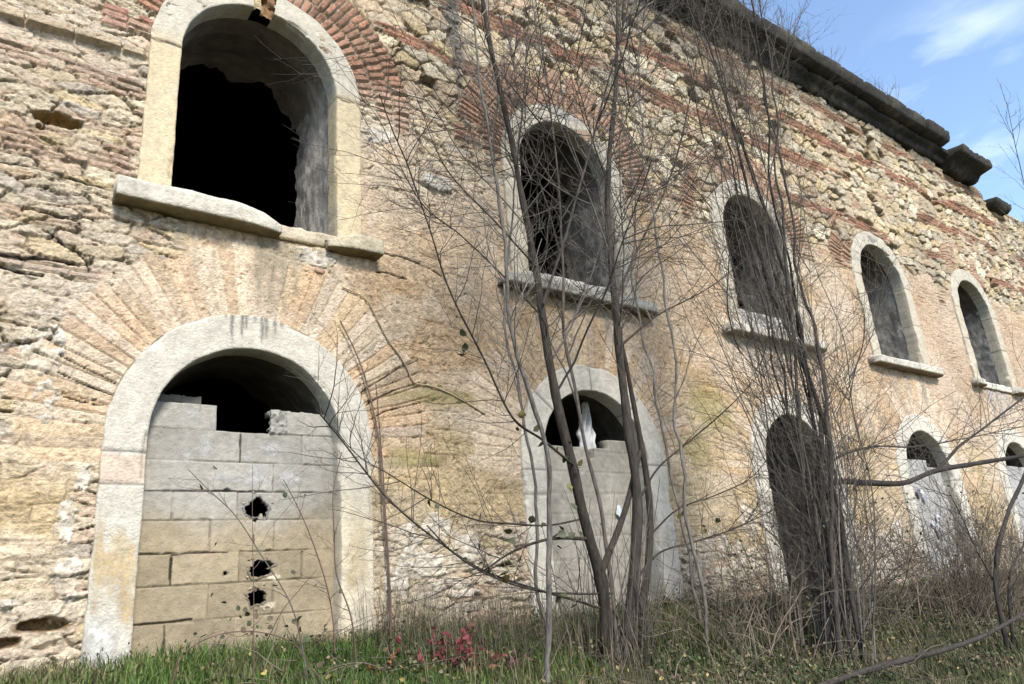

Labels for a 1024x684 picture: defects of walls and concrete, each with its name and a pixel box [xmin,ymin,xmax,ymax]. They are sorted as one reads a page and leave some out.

spalling [36,109,79,130]
spalling [244,557,281,610]
spalling [0,619,72,649]